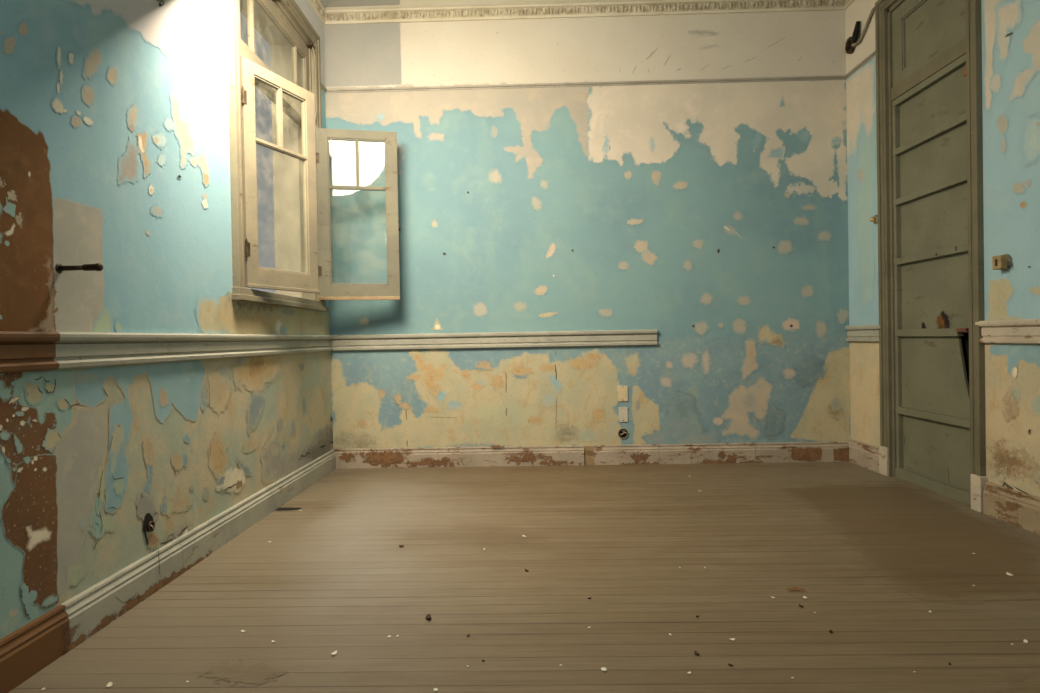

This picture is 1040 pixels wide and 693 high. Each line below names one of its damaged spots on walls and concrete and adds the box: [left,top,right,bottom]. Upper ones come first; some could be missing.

peeling [51,46,119,129]
peeling [69,0,229,135]
peeling [983,0,1040,155]
peeling [117,91,210,219]
peeling [325,56,878,442]
peeling [987,276,1040,321]
peeling [0,360,212,655]
peeling [189,346,660,501]
peeling [701,451,762,464]
peeling [790,346,851,461]
peeling [989,344,1040,417]